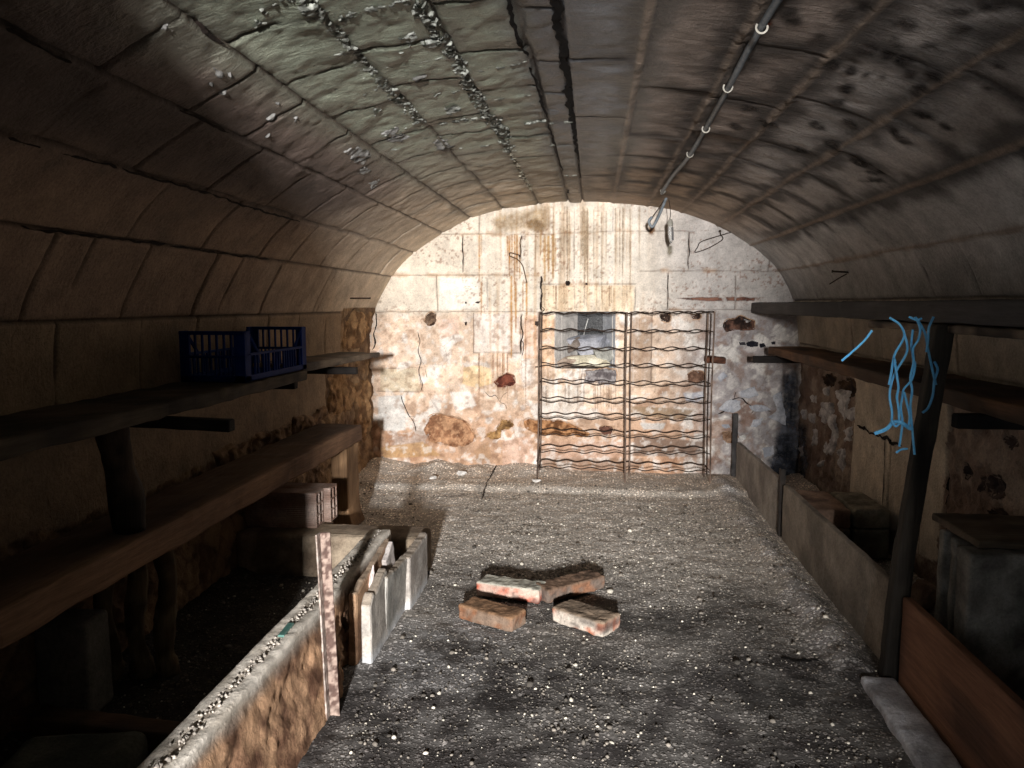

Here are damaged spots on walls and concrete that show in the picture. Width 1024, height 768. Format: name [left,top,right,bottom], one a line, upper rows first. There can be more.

peeling [209,67,233,95]
damp [826,59,869,105]
damp [850,155,883,182]
rust [507,236,527,357]
spalling [494,373,516,387]
spalling [424,413,615,447]
damp [770,372,809,478]
peeling [798,373,857,471]
crack [429,465,497,499]
crack [857,425,902,505]